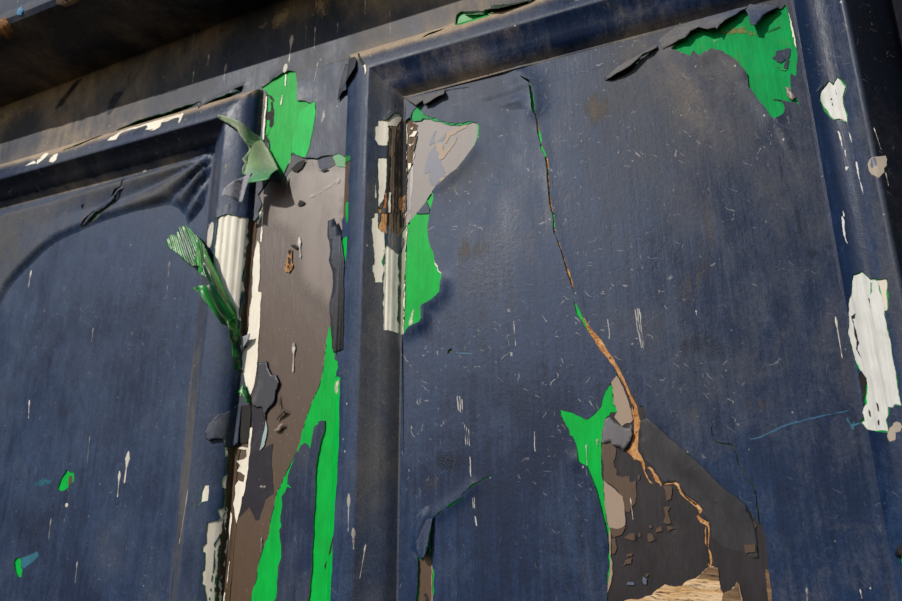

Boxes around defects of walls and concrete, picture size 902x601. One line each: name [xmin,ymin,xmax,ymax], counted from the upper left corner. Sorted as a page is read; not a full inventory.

peeling [166,71,350,601]
peeling [371,87,479,334]
peeling [455,0,532,25]
crack [523,78,712,567]
peeling [658,4,799,118]
peeling [816,77,848,123]
peeling [847,272,901,433]
peeling [561,374,772,601]